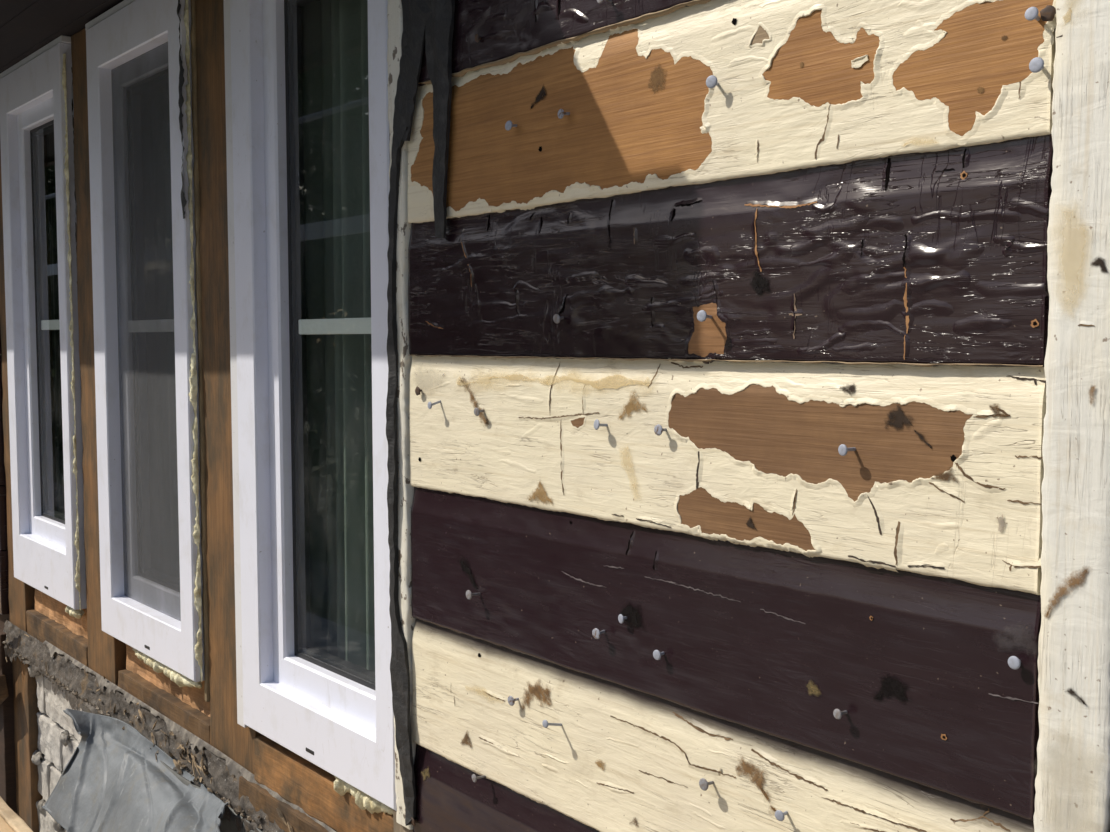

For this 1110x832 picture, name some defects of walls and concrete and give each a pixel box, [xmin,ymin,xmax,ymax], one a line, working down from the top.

peeling [409,24,717,218]
peeling [748,0,1057,145]
crack [519,361,600,495]
crack [562,514,805,624]
peeling [684,299,731,364]
peeling [674,482,823,558]
peeling [665,378,977,508]
crack [848,495,945,572]
crack [923,462,1042,505]
crack [974,409,1011,419]
crack [1006,371,1046,386]
crack [597,709,1010,832]